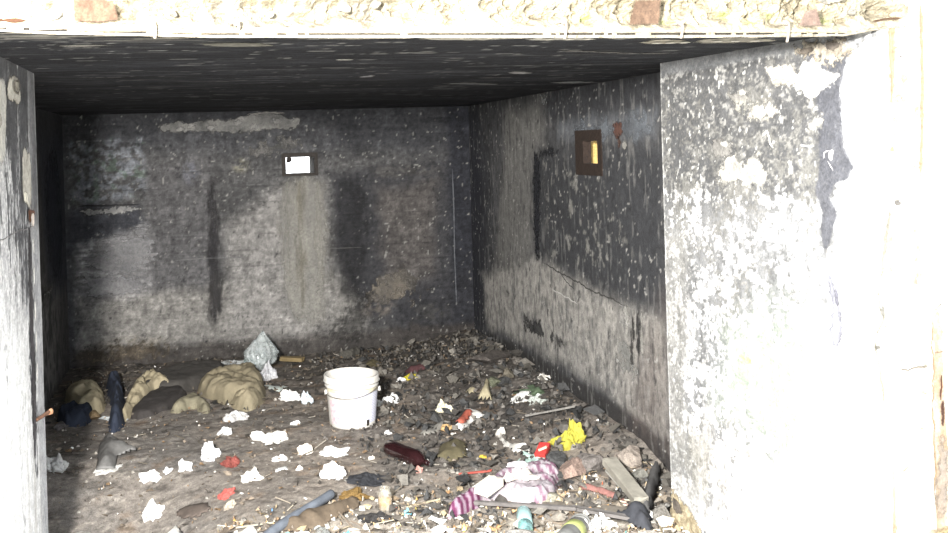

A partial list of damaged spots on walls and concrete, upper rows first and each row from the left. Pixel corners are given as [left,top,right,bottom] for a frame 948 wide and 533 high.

peeling [0,76,21,164]
corrosion [73,0,118,22]
peeling [159,112,302,163]
spalling [0,0,909,99]
corrosion [629,0,661,25]
peeling [712,138,770,193]
peeling [727,87,778,121]
peeling [808,113,824,133]
corrosion [872,17,901,158]
damp [207,181,222,322]
damp [280,176,368,341]
corrosion [931,303,948,533]